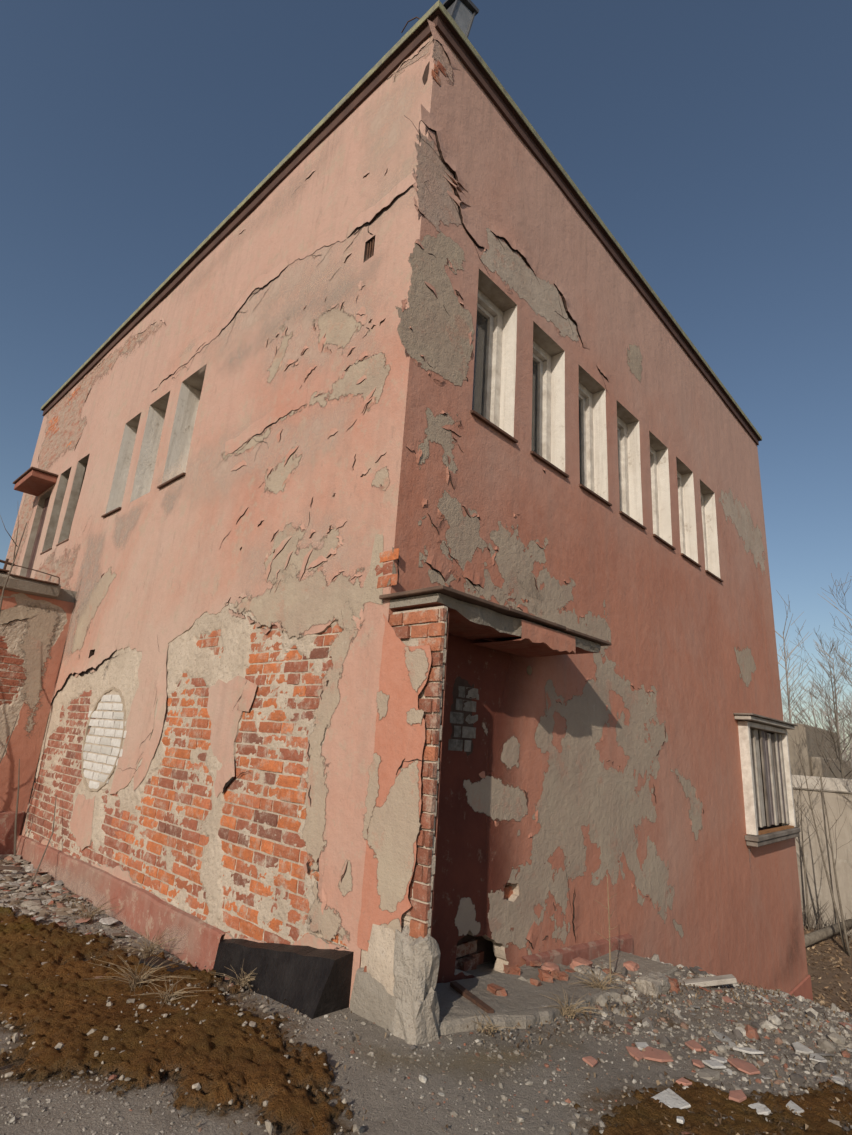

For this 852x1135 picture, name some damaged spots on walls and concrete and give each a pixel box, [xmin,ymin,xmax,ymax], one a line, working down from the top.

peeling [221,130,475,495]
crack [154,104,611,390]
flaking render [480,228,579,342]
spalling [0,568,117,758]
crack [51,639,118,705]
spalling [26,497,399,950]
peeling [362,753,421,933]
peeling [404,408,704,971]